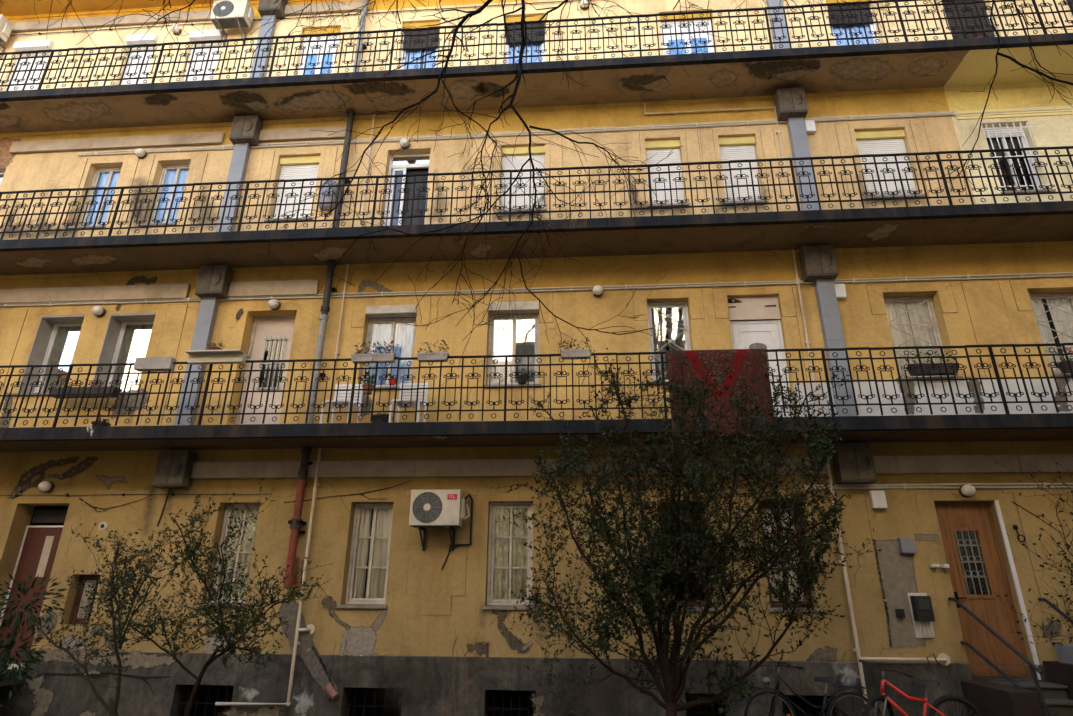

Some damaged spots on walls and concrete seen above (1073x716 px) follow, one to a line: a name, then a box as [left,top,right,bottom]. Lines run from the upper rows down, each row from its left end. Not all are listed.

flaking render [0,137,21,167]
flaking render [8,456,127,499]
flaking render [304,589,353,630]
flaking render [466,642,489,657]
flaking render [492,610,532,653]